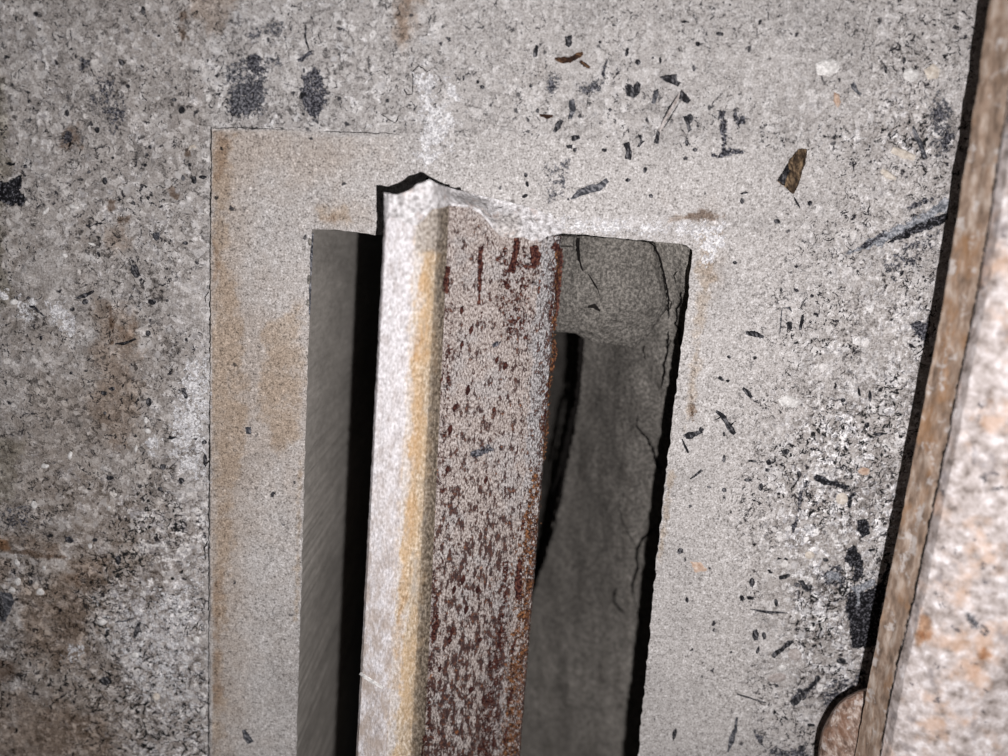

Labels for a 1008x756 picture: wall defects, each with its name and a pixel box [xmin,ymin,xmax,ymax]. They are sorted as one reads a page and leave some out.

rust [421,563,439,756]
rust [436,266,456,500]
rust [473,238,564,756]
crack [613,511,655,624]
crack [636,415,660,471]
crack [643,240,682,387]